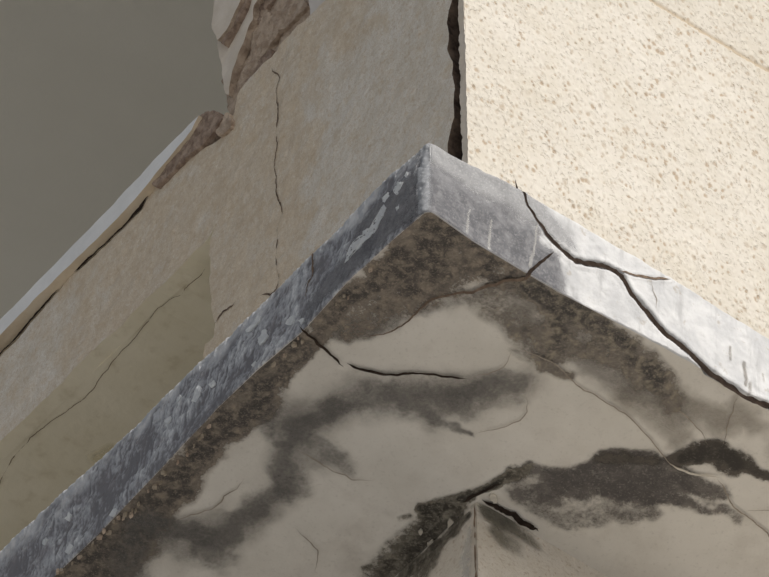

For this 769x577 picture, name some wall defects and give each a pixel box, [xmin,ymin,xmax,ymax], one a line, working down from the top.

flaking render [221,0,310,104]
flaking render [152,110,235,189]
crack [272,71,282,212]
peeling [176,380,216,403]
crack [260,234,279,296]
damp [54,143,769,577]
crack [294,327,769,537]
crack [372,180,769,443]
spalling [91,501,140,547]